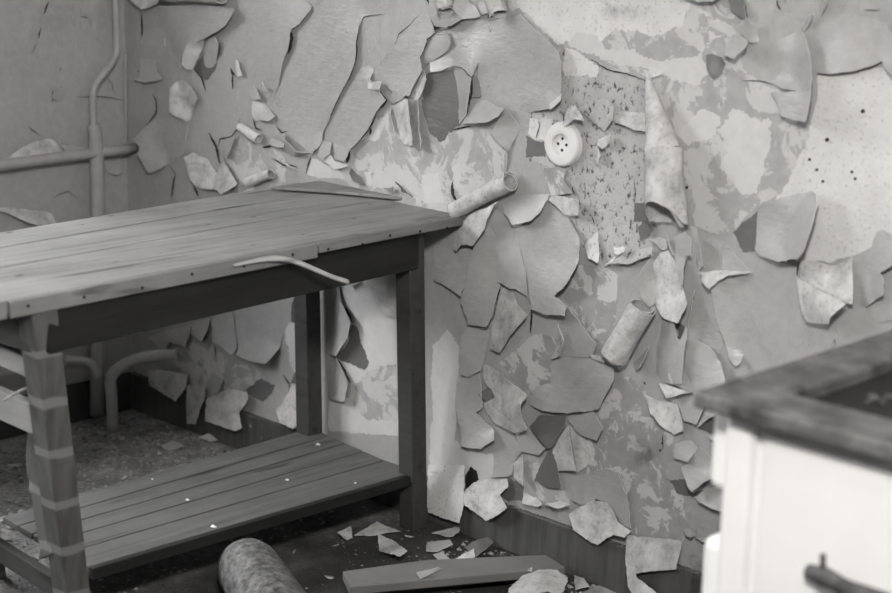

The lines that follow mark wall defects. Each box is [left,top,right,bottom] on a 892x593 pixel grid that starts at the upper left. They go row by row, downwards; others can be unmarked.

peeling [131,0,234,173]
peeling [0,207,56,226]
peeling [148,297,296,431]
peeling [184,0,892,593]